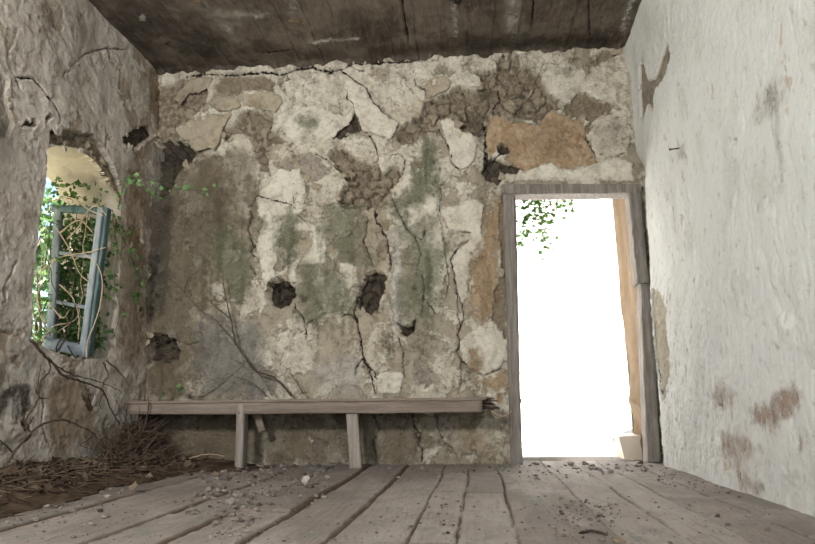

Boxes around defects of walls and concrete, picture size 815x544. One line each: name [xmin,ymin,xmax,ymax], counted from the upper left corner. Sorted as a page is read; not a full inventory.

flaking render [637,45,670,123]
crack [482,90,501,180]
crack [247,183,307,275]
flaking render [123,53,635,316]
leakage [390,211,408,330]
crack [362,196,477,381]
crack [294,297,377,393]
leakage [0,385,29,424]
crack [412,413,455,463]